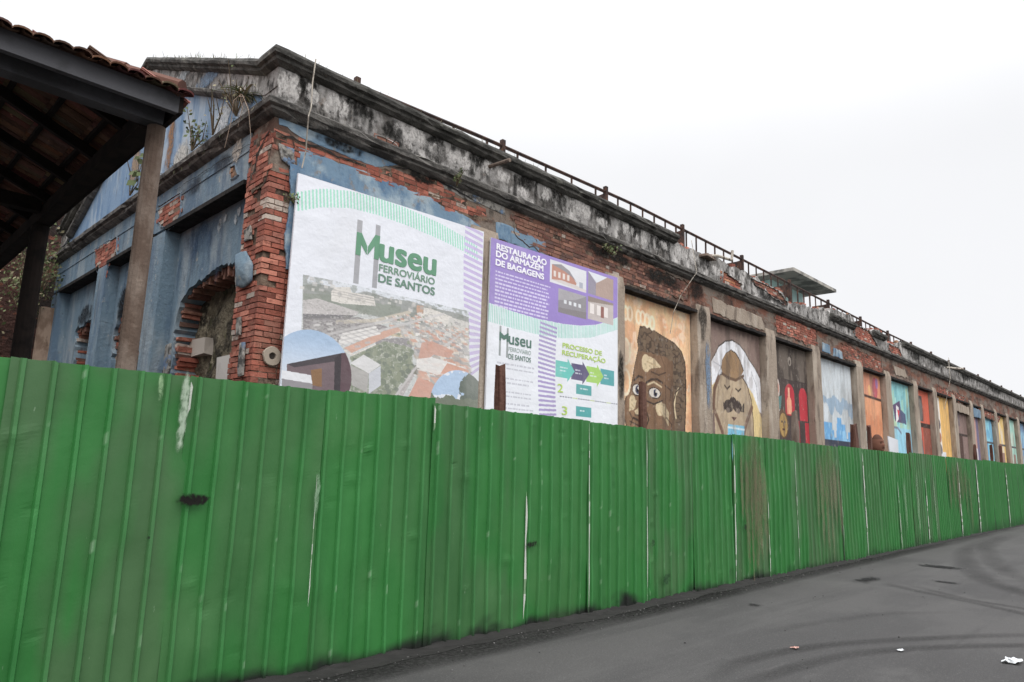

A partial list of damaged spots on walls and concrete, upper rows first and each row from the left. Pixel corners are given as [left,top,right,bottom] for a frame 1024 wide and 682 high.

damp [278,71,373,130]
damp [317,136,361,156]
damp [385,120,610,228]
flaking render [156,192,184,230]
flaking render [94,236,119,281]
flaking render [217,118,691,385]
damp [590,244,629,265]
damp [622,223,696,265]
flaking render [712,264,908,378]